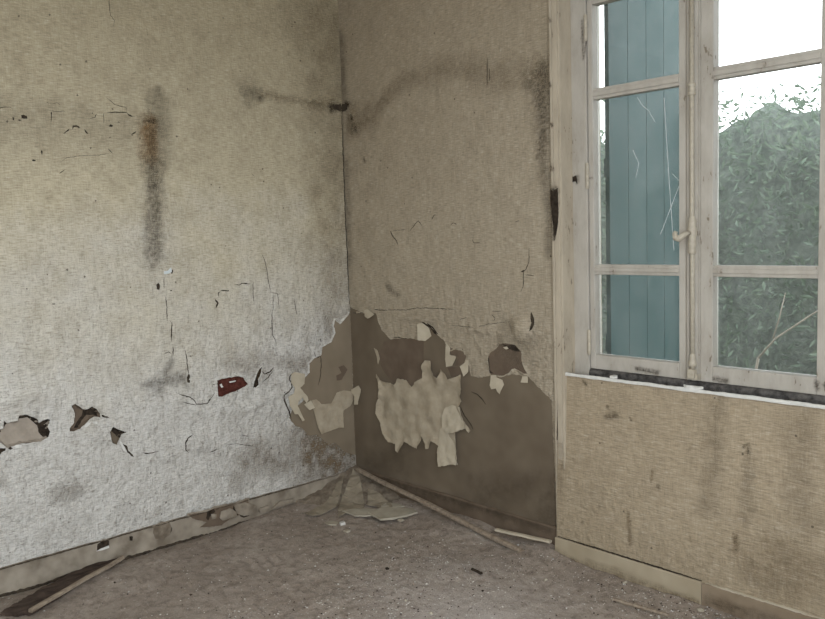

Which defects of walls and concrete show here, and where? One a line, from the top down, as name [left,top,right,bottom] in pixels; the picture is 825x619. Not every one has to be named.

leakage [330,102,352,120]
crack [235,253,297,342]
flaking render [213,365,274,400]
spalling [0,411,53,454]
spalling [66,401,134,457]
peeling [284,307,556,526]